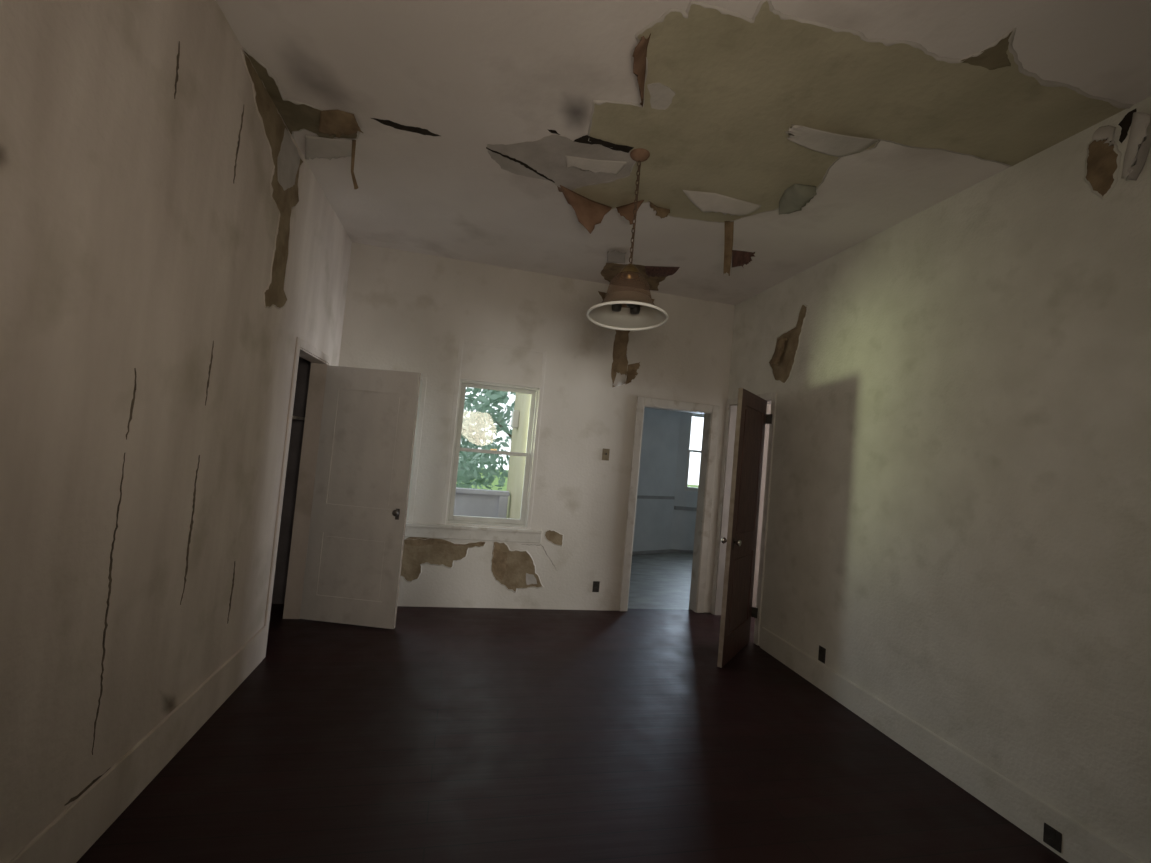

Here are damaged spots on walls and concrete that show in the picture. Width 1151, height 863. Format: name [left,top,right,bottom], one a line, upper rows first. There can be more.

crack [173,41,181,99]
crack [233,106,244,183]
peeling [240,47,363,309]
crack [371,118,440,136]
peeling [486,0,1151,276]
peeling [597,250,680,303]
crack [205,341,214,406]
peeling [610,329,640,388]
peeling [768,304,808,384]
crack [65,368,137,805]
crack [180,455,200,605]
spalling [400,530,563,593]